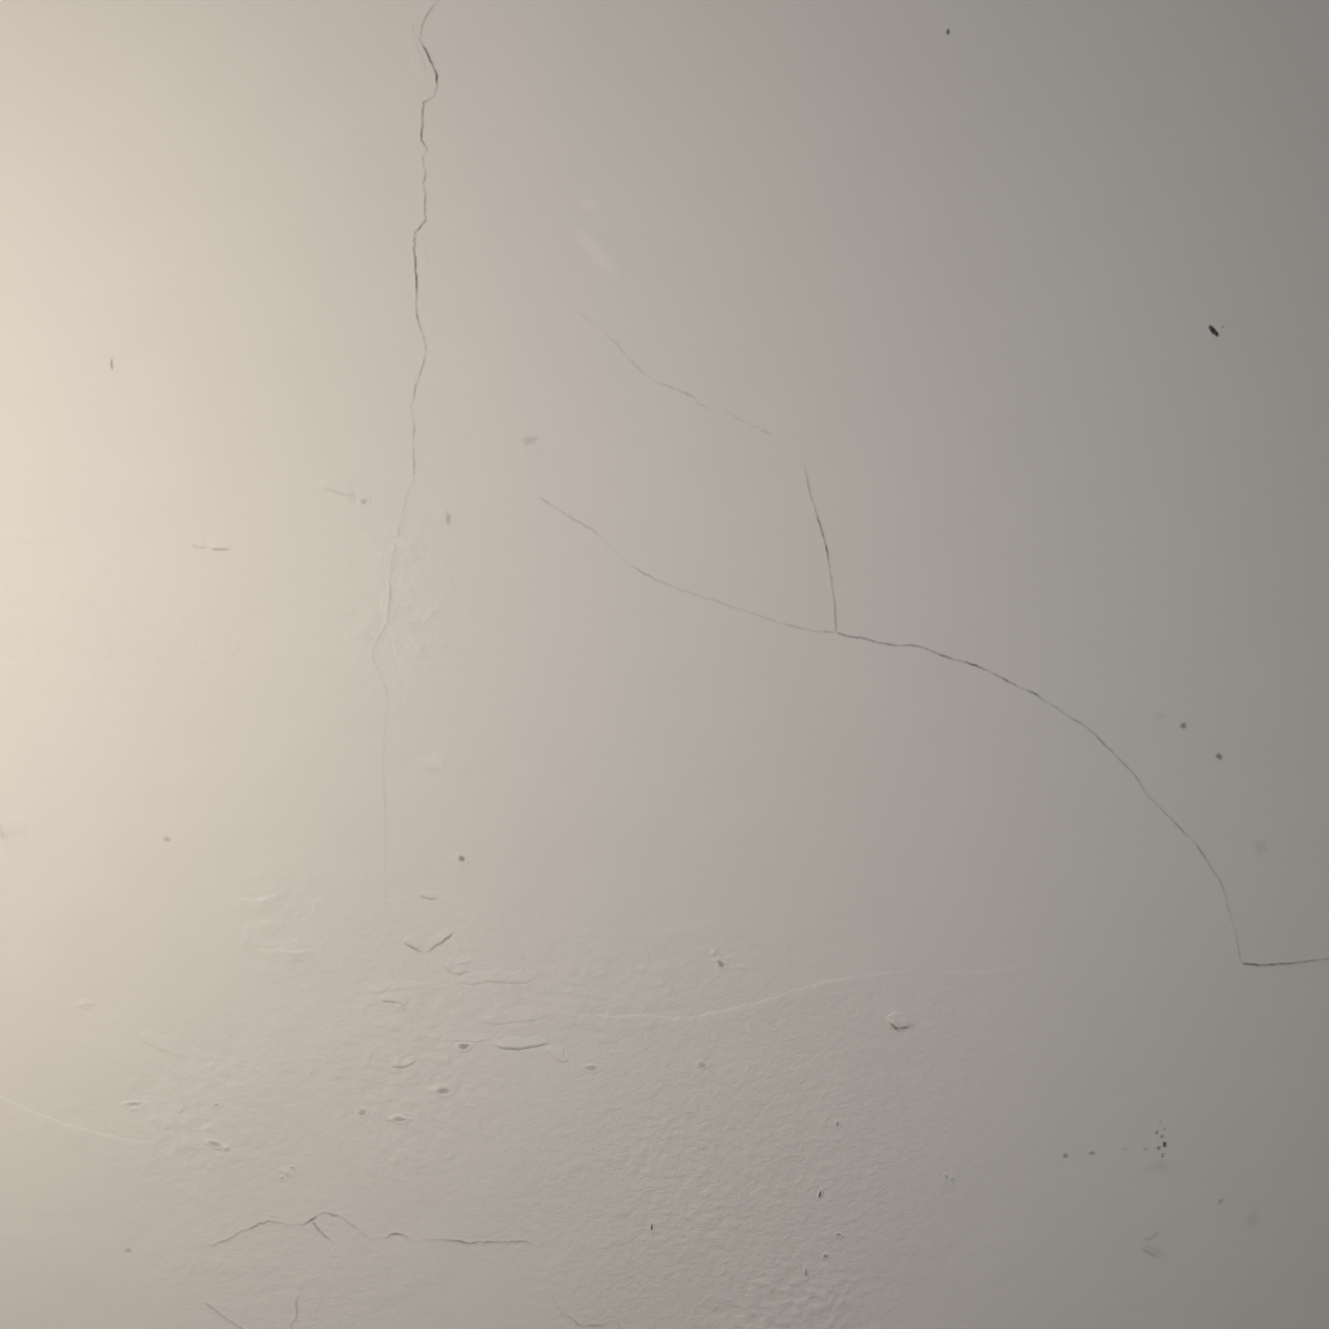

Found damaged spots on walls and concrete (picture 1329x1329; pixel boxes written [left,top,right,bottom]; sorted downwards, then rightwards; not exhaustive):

crack [369,0,445,961]
crack [535,463,1329,969]
crack [182,1210,539,1329]